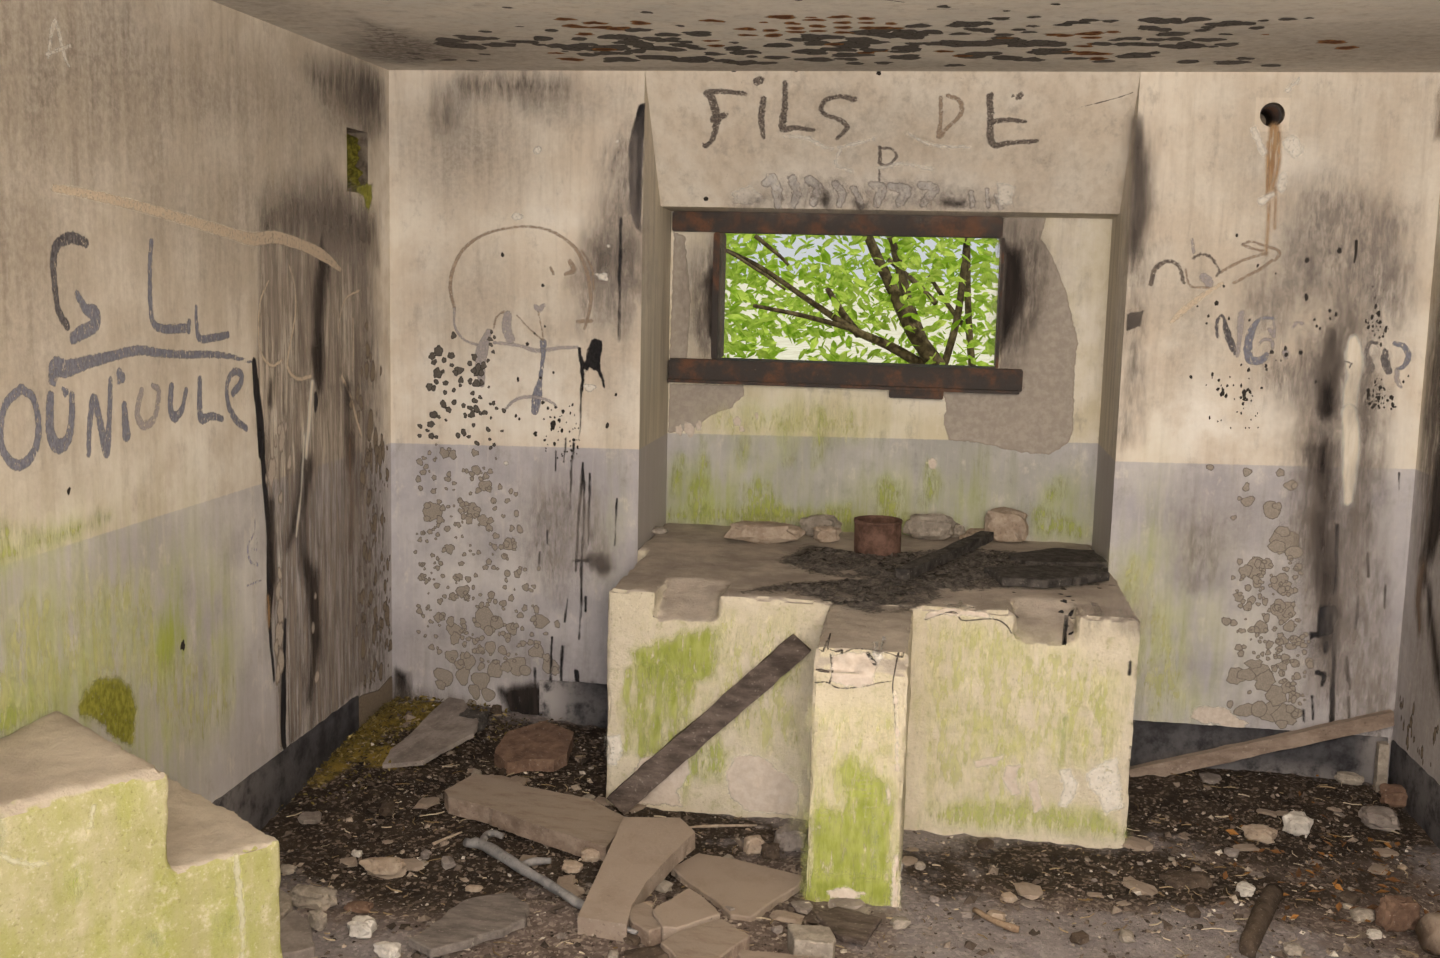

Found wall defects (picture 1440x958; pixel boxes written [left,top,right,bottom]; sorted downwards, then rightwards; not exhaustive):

peeling [407,4,1313,67]
corrosion [1266,124,1280,252]
damp [252,242,329,749]
damp [341,376,362,549]
peeling [413,329,560,705]
peeling [1191,468,1314,729]
damp [1303,330,1363,722]
damp [1416,456,1440,697]